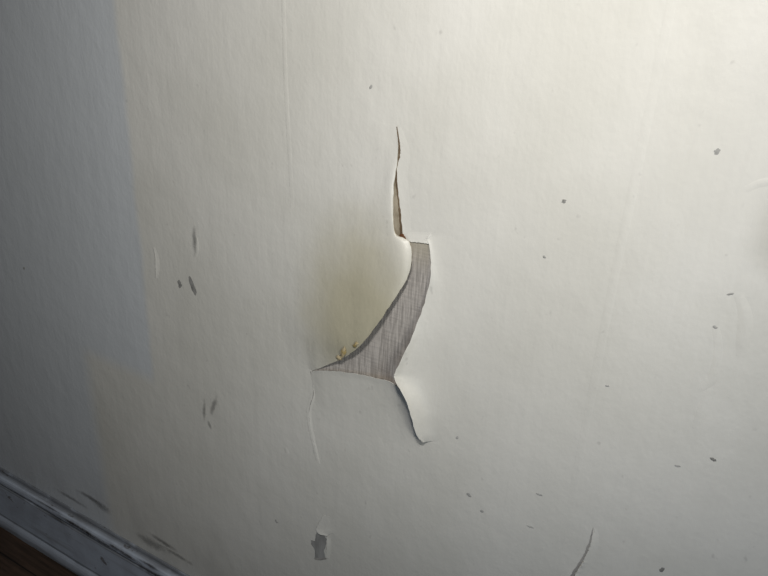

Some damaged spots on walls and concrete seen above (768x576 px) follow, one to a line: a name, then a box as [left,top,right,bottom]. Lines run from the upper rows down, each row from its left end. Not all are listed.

peeling [280,120,481,449]
peeling [311,515,337,560]
crack [570,528,599,576]